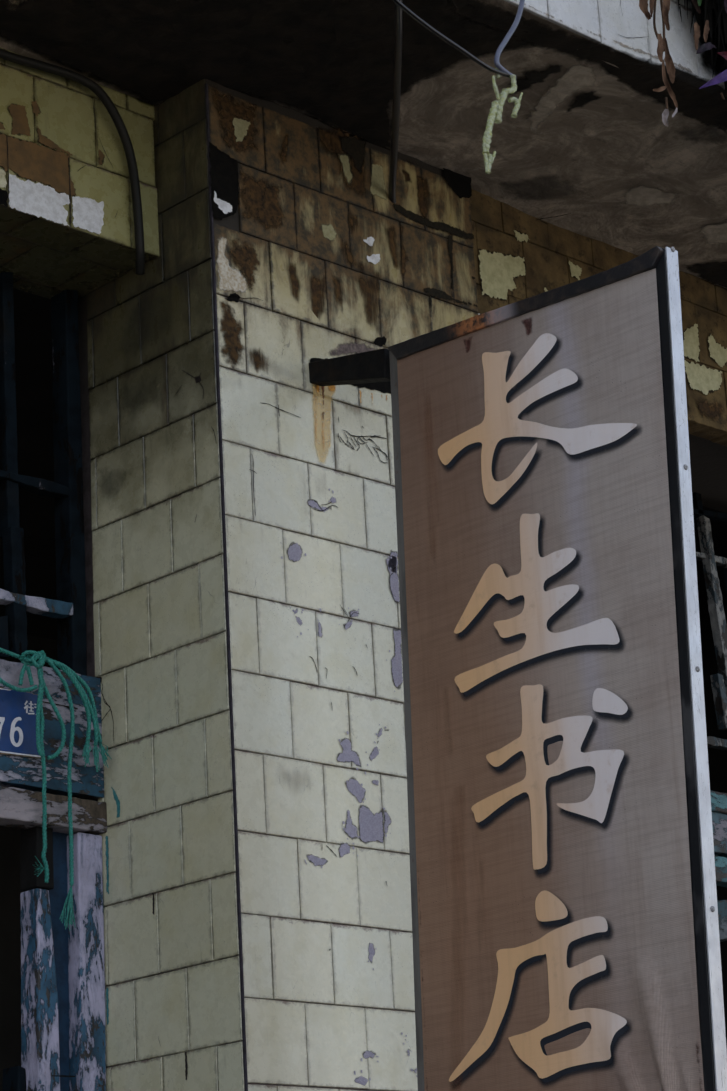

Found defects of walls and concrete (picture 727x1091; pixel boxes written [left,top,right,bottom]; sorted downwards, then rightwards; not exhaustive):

spalling [0,101,104,235]
peeling [514,229,529,242]
peeling [478,248,526,302]
peeling [568,261,582,280]
peeling [683,324,727,396]
spalling [308,489,336,512]
spalling [281,542,307,562]
spalling [386,550,400,604]
spalling [290,607,322,637]
spalling [386,627,403,692]
spalling [337,724,391,857]
spalling [304,855,327,868]